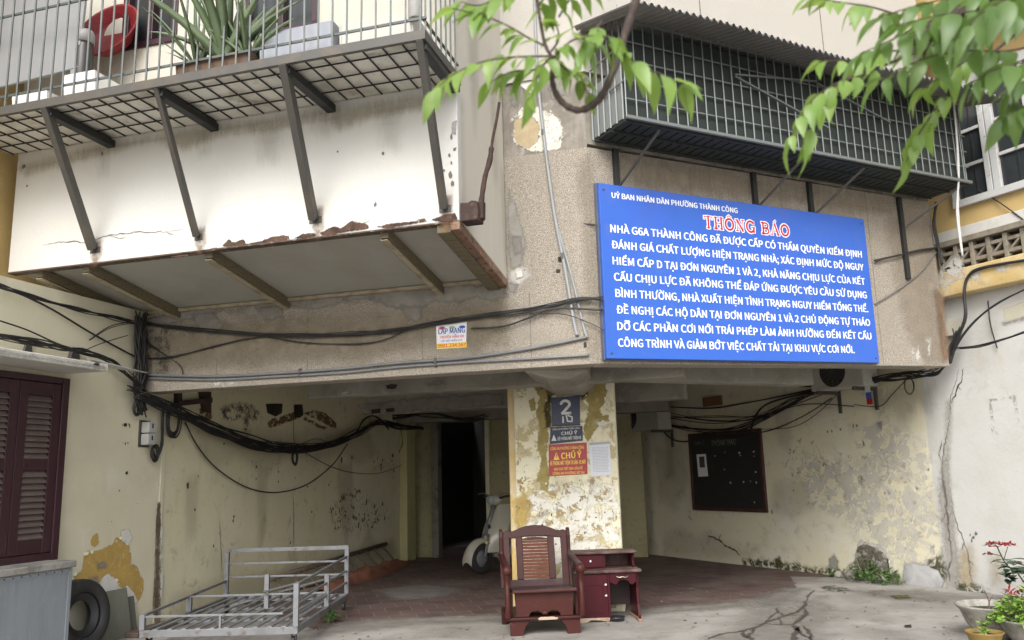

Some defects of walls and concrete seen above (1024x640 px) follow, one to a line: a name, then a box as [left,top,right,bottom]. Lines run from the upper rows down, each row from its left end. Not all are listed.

peeling [510,77,565,152]
crack [42,229,182,246]
spalling [171,213,457,258]
peeling [516,383,620,576]
crack [939,370,972,582]
peeling [74,502,163,623]
crack [688,516,739,555]
spalling [849,503,947,579]
crack [705,590,815,640]